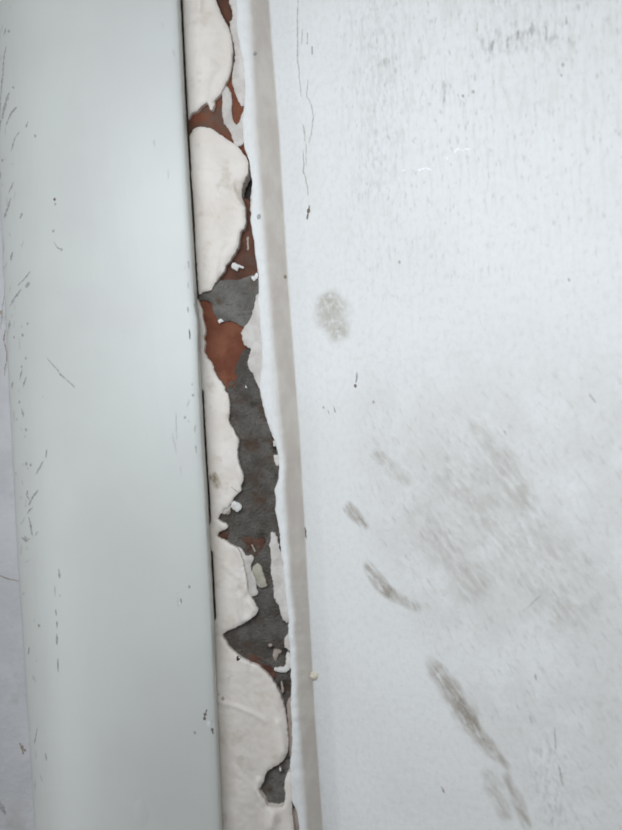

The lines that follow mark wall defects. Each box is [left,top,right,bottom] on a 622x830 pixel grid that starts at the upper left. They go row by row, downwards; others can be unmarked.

spalling [182,0,299,830]